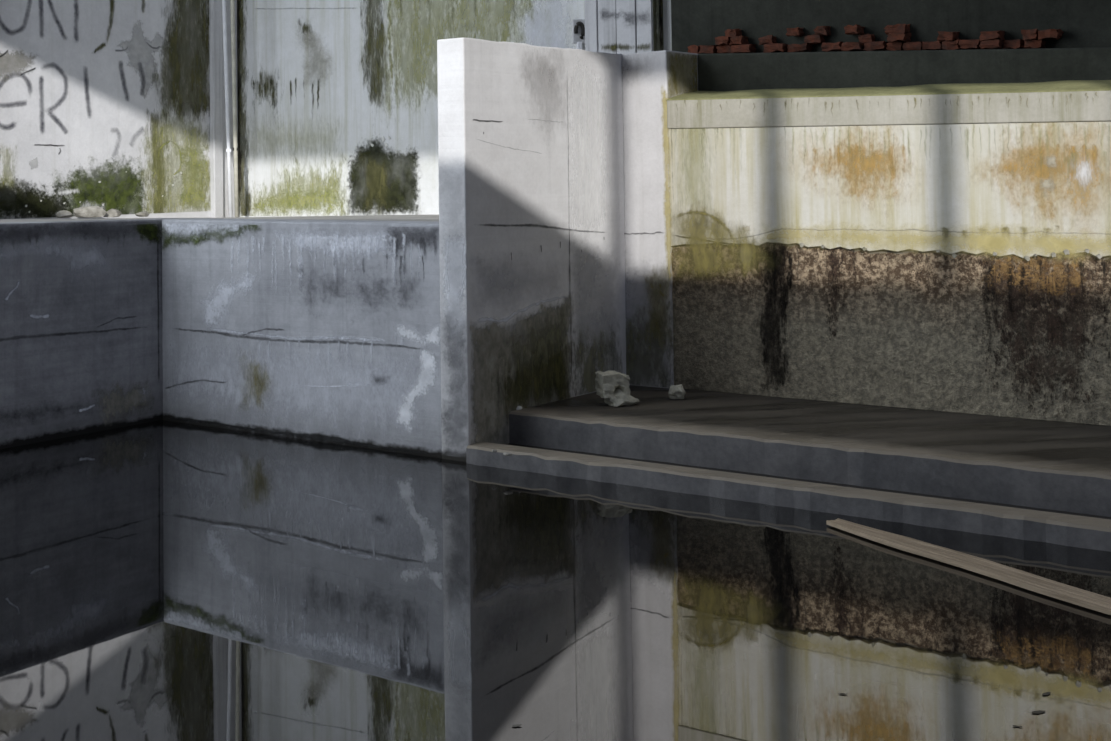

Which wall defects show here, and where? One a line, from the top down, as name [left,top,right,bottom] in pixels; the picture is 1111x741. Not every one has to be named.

crack [0,241,422,389]
water stain [150,114,808,444]
water stain [894,227,1111,256]
corrosion [1006,145,1102,205]